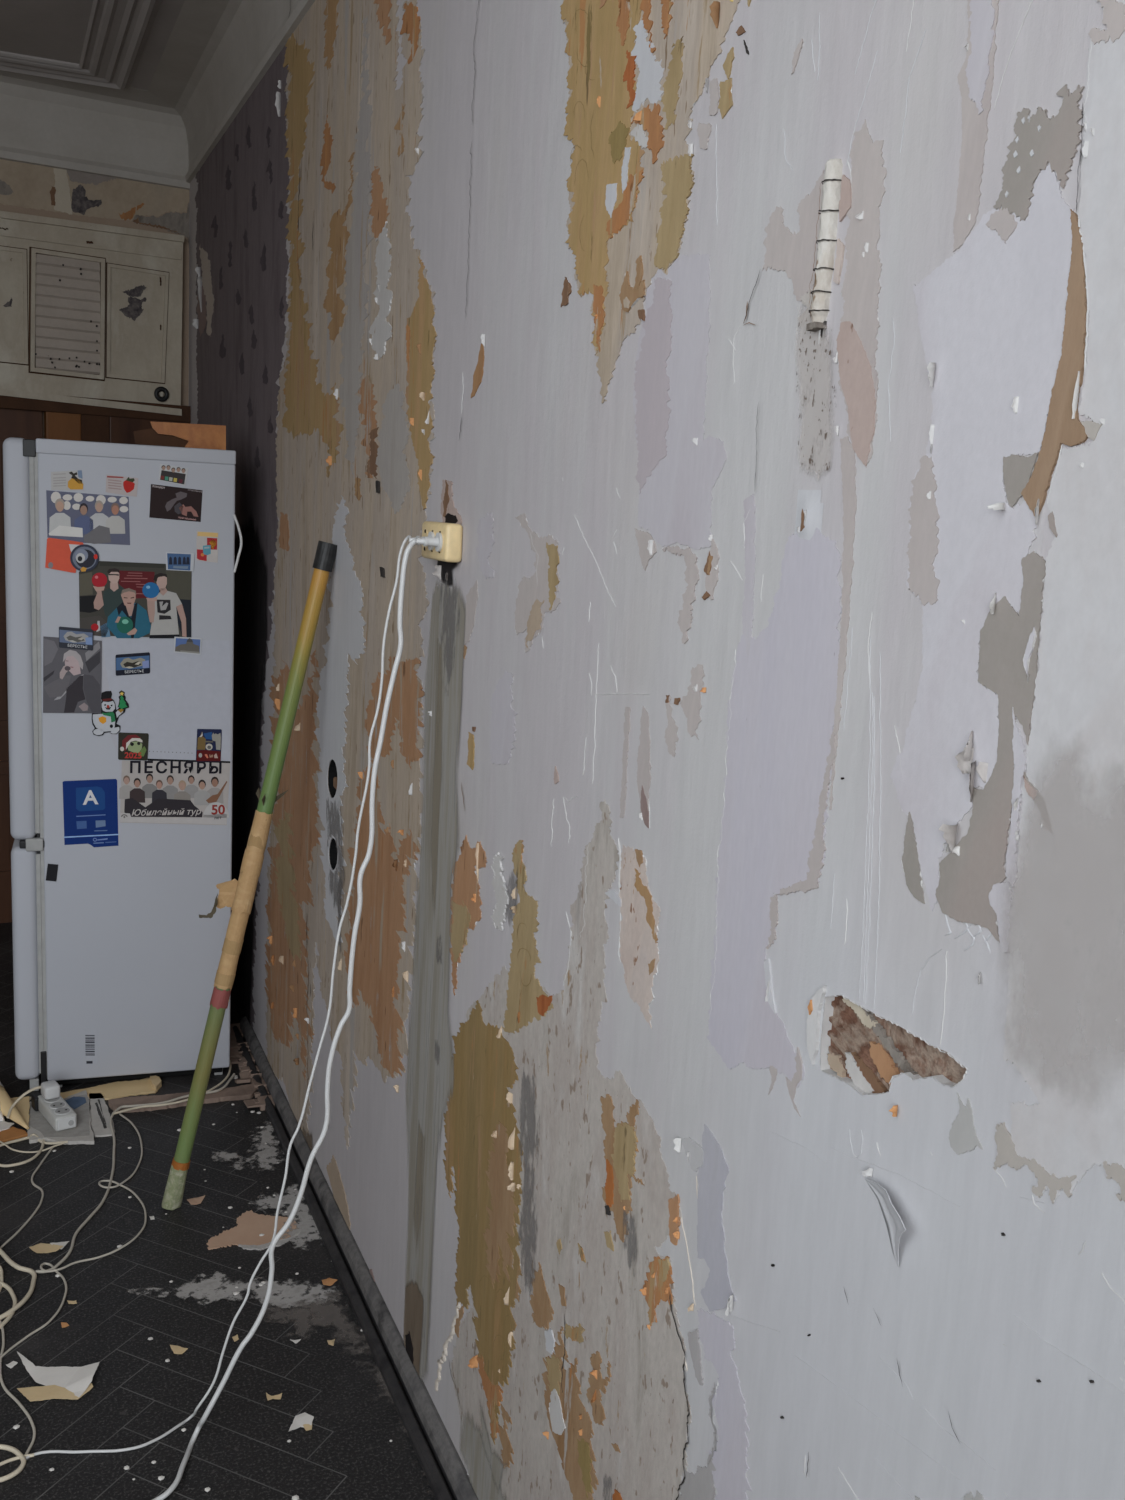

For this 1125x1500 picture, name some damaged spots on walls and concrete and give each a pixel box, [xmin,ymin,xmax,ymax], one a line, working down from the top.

peeling [264,0,462,1150]
water stain [405,580,465,1380]
peeling [442,664,752,1500]
peeling [560,0,751,403]
spalling [806,985,983,1155]
peeling [901,551,1046,953]